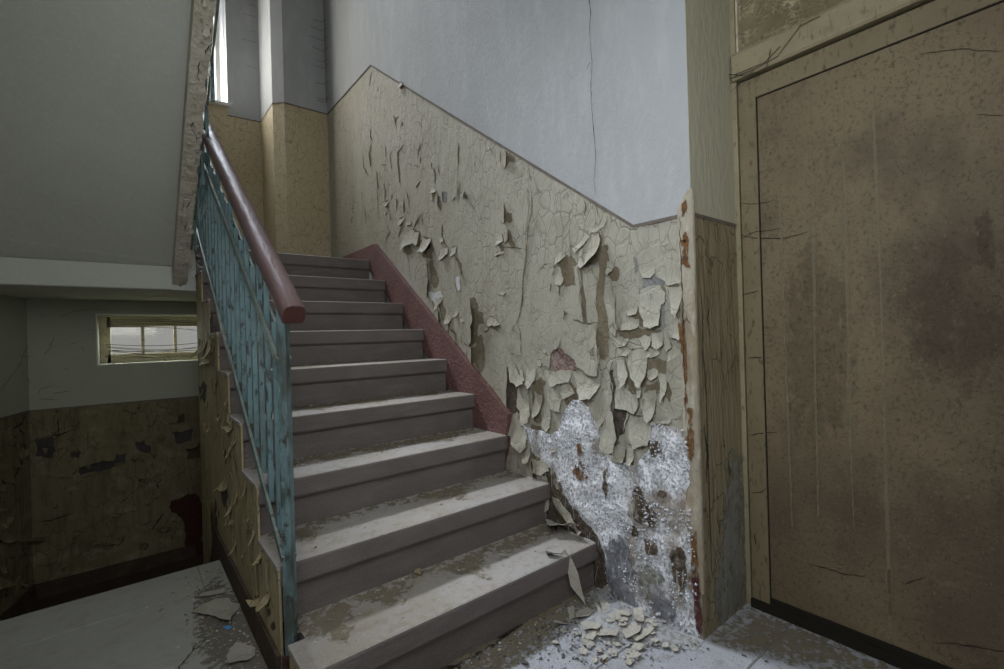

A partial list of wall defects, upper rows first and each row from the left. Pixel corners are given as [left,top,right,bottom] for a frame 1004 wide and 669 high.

peeling [190,313,217,409]
spalling [167,397,276,630]
peeling [362,131,501,373]
peeling [494,205,516,257]
peeling [500,188,706,663]
leakage [522,400,700,637]
rust [681,232,690,267]